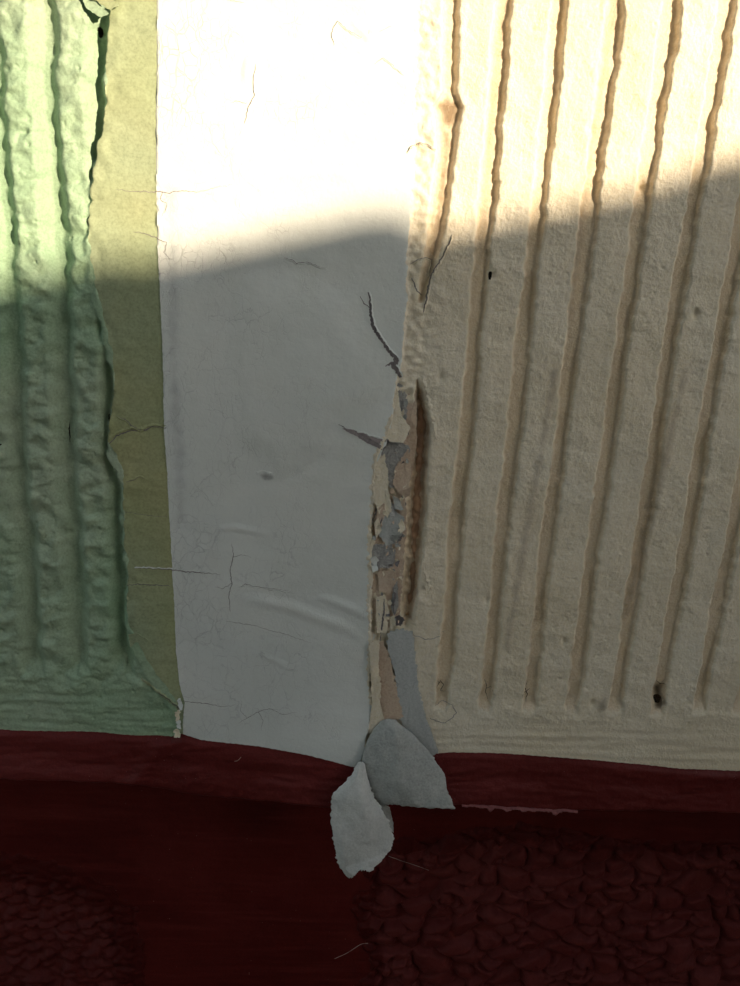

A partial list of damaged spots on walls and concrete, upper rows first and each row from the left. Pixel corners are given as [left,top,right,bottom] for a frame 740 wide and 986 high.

crack [331,21,405,76]
crack [233,64,257,124]
crack [117,184,232,210]
crack [360,291,403,378]
crack [340,425,389,450]
crack [134,547,310,643]
peeling [330,375,578,878]